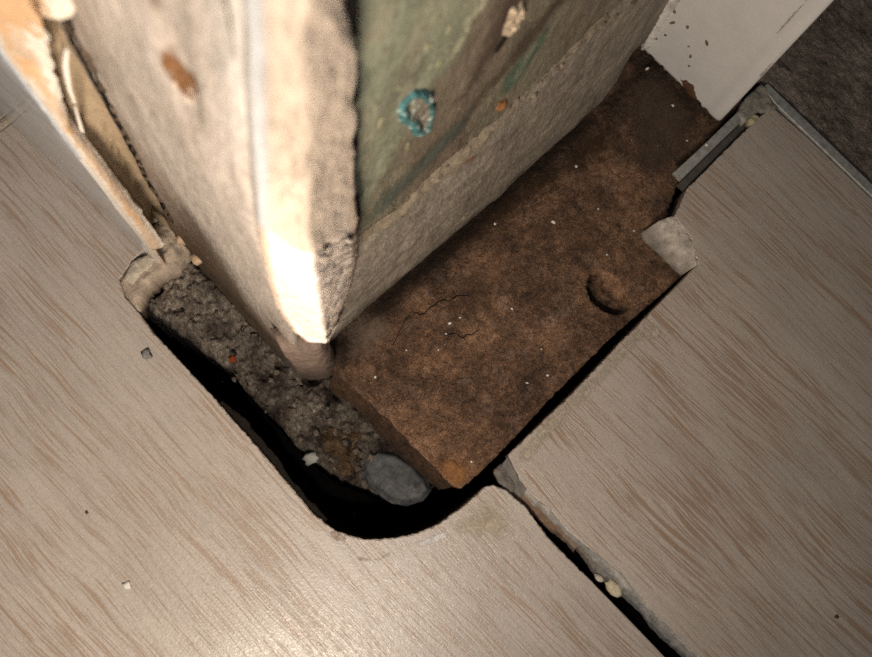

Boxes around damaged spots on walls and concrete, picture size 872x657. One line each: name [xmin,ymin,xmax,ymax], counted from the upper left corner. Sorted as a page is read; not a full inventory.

peeling [0,19,166,250]
crack [61,18,174,223]
spalling [161,54,199,104]
spalling [241,0,619,382]